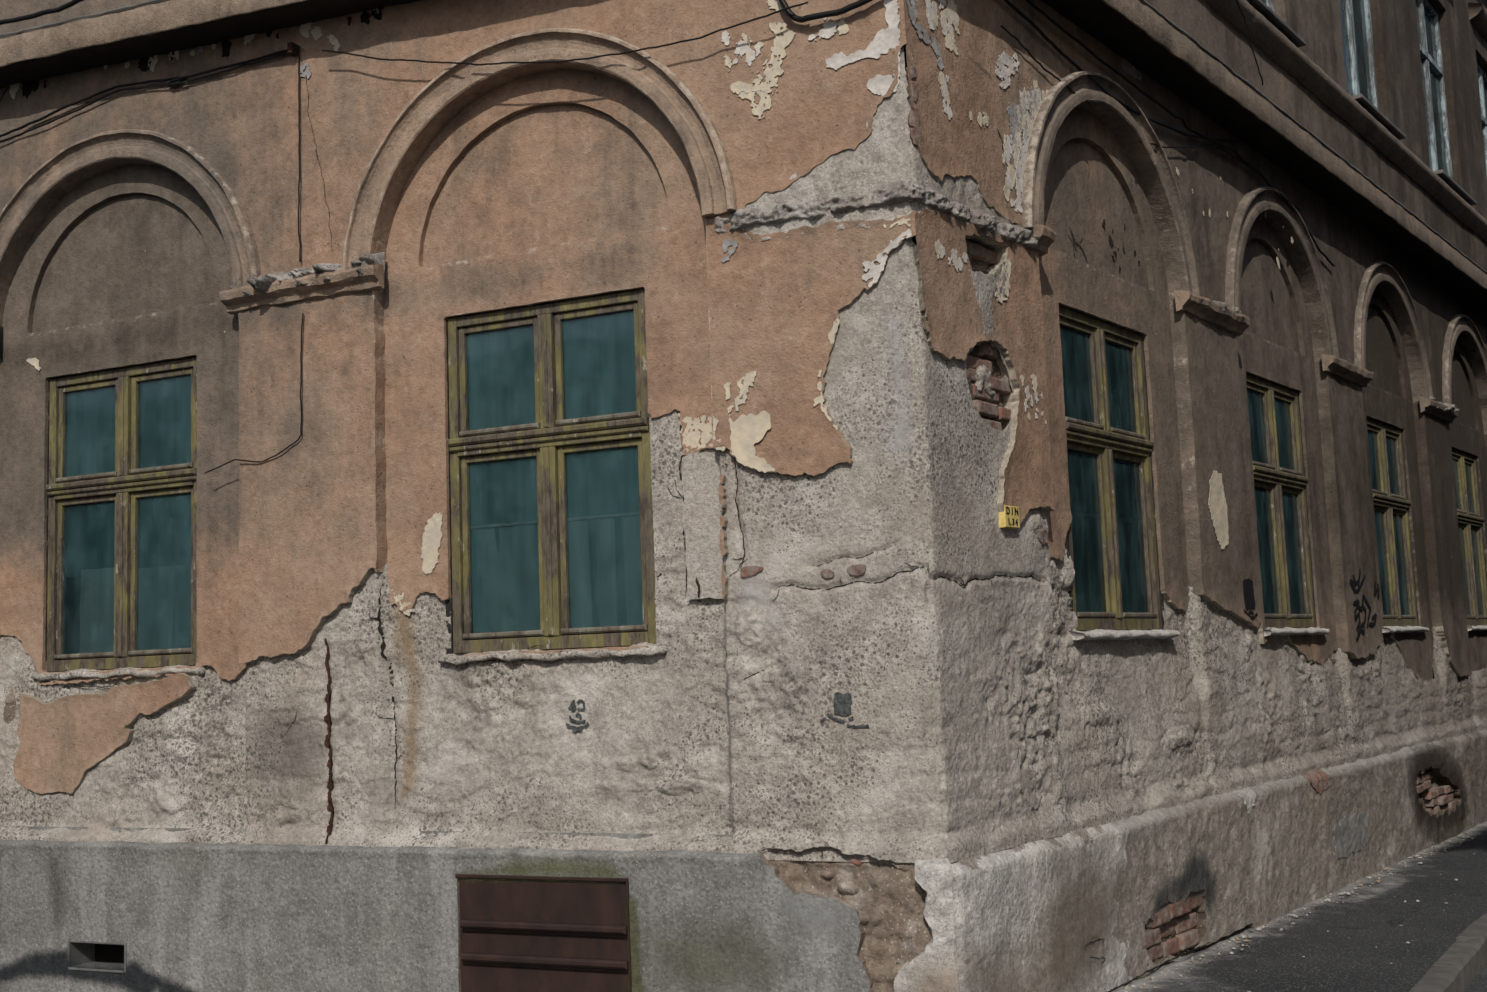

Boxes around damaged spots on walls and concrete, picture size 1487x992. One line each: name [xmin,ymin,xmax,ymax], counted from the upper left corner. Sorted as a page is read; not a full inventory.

peeling [722,0,849,119]
flaking render [742,0,1015,241]
peeling [995,51,1020,89]
peeling [1001,80,1049,213]
peeling [1102,219,1140,272]
flaking render [0,229,1487,992]